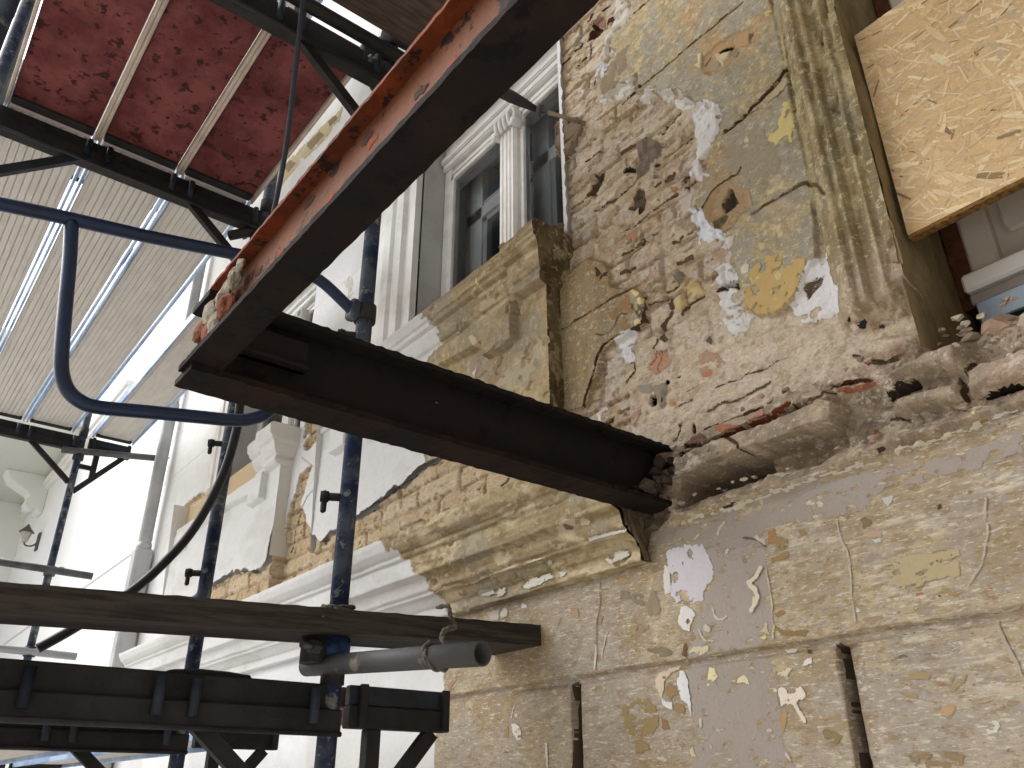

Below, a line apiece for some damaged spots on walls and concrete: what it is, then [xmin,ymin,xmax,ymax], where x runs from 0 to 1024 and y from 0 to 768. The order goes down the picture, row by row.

crack [622,2,743,105]
crack [723,69,789,134]
peeling [766,77,795,145]
spalling [703,182,752,232]
crack [753,181,825,215]
crack [561,113,742,408]
spalling [803,276,824,299]
crack [660,357,837,471]
peeling [478,557,545,622]
peeling [524,572,566,589]
peeling [605,550,629,564]
peeling [651,406,1024,768]